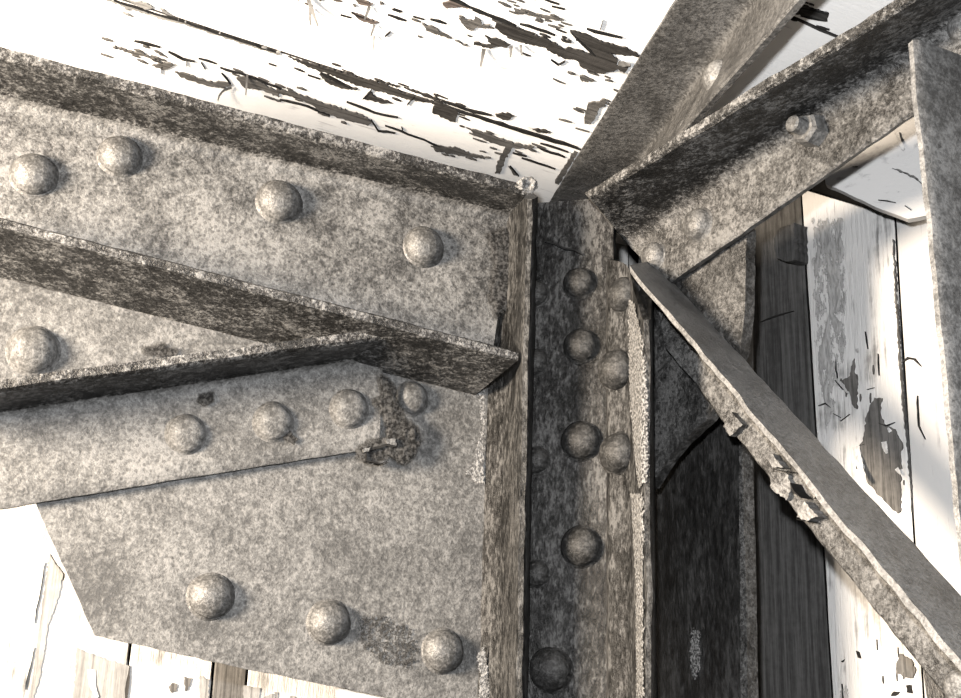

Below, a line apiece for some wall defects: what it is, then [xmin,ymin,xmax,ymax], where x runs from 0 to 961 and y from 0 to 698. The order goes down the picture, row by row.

peeling [100,0,578,185]
peeling [298,0,640,133]
peeling [811,218,905,514]
corrosion [355,374,421,466]
corrosion [723,412,748,437]
corrosion [766,453,827,524]
peeling [25,555,63,698]
peeling [72,648,130,698]
peeling [168,676,209,698]
peeling [243,685,295,698]
corrosion [356,615,420,670]